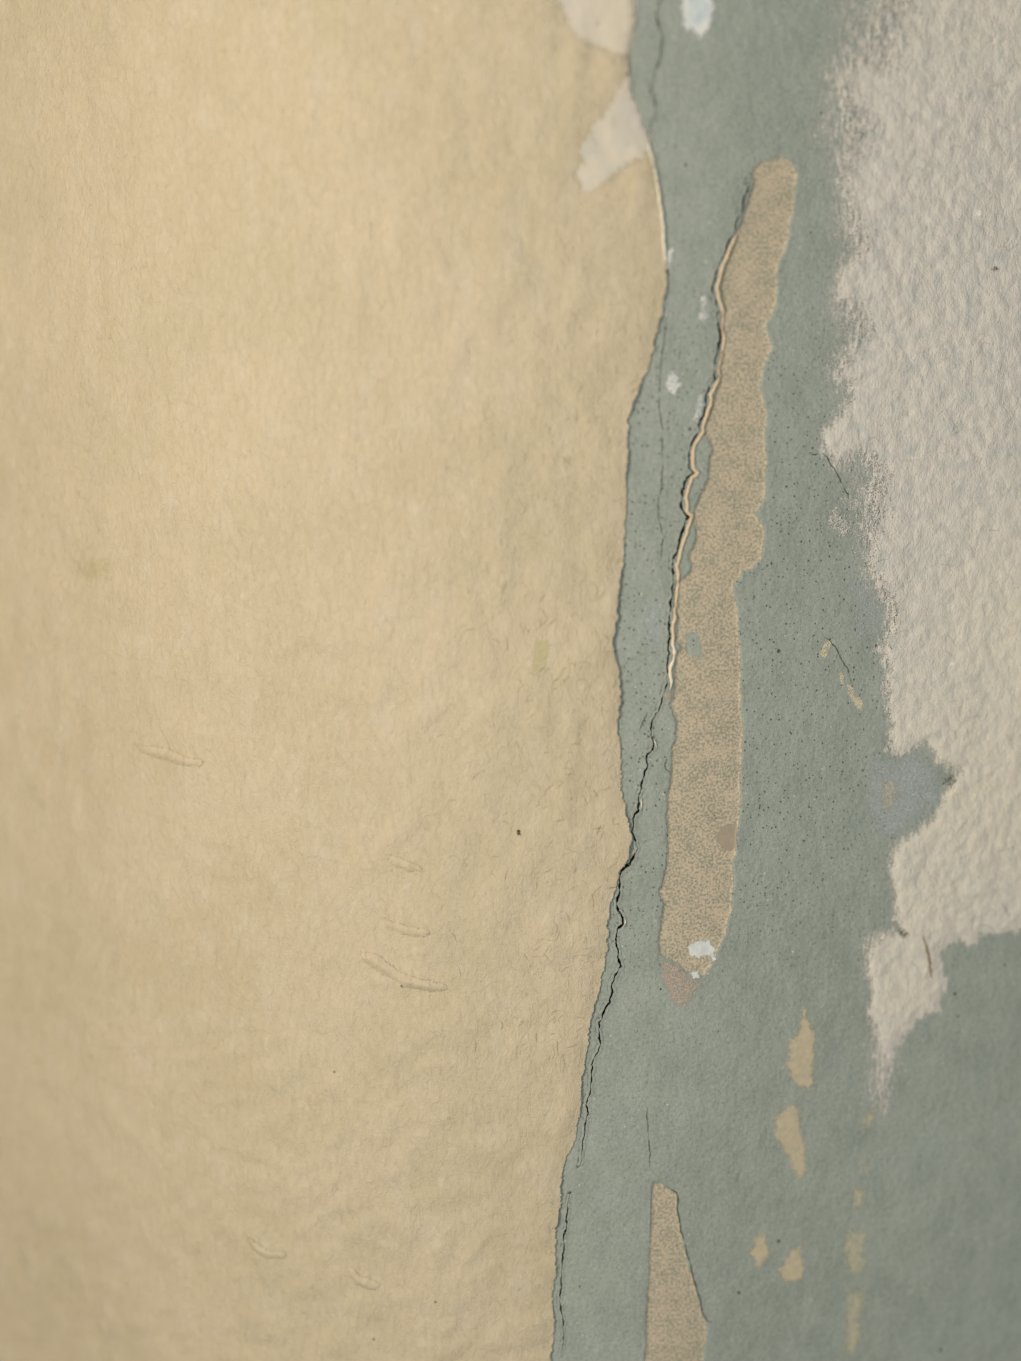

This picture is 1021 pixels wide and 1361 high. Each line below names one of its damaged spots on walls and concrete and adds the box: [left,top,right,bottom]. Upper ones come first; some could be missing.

spalling [658,157,797,979]
crack [556,174,753,1357]
spalling [785,1005,816,1090]
spalling [773,1105,808,1178]
spalling [644,1183,707,1361]
spalling [750,1231,805,1283]